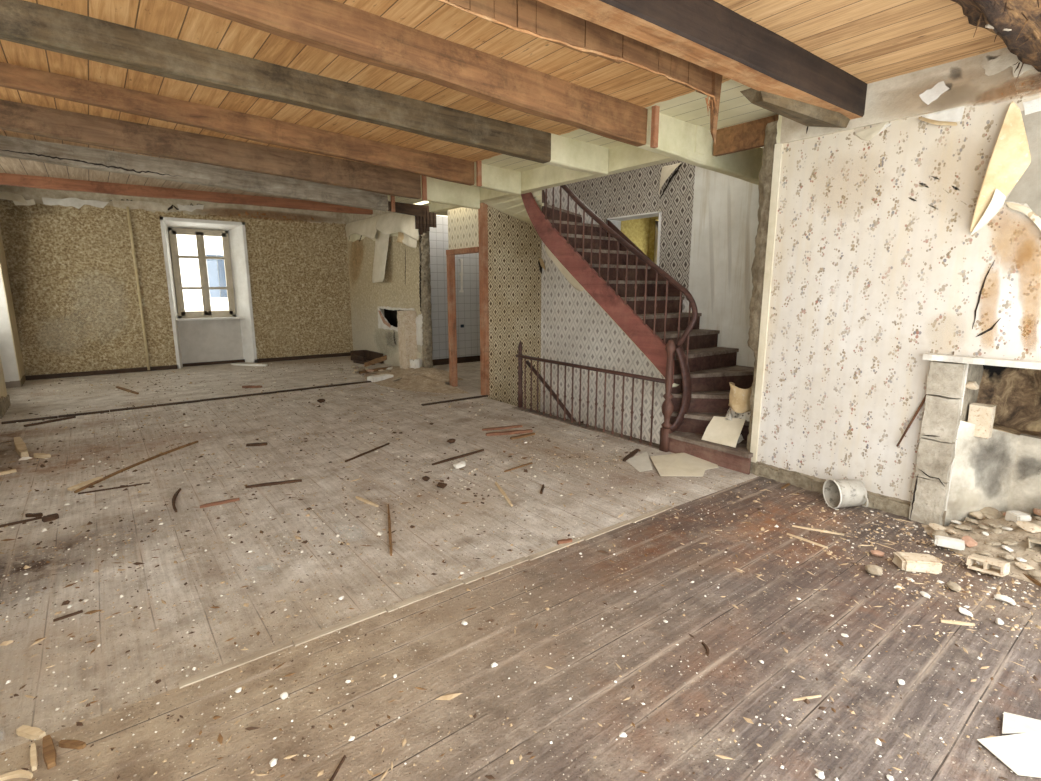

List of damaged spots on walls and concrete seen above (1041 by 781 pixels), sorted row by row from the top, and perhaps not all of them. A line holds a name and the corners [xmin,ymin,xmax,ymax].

peeling [981,53,1035,77]
peeling [919,81,950,105]
crack [2,150,182,177]
flaking render [1005,111,1041,218]
spalling [977,365,1041,431]